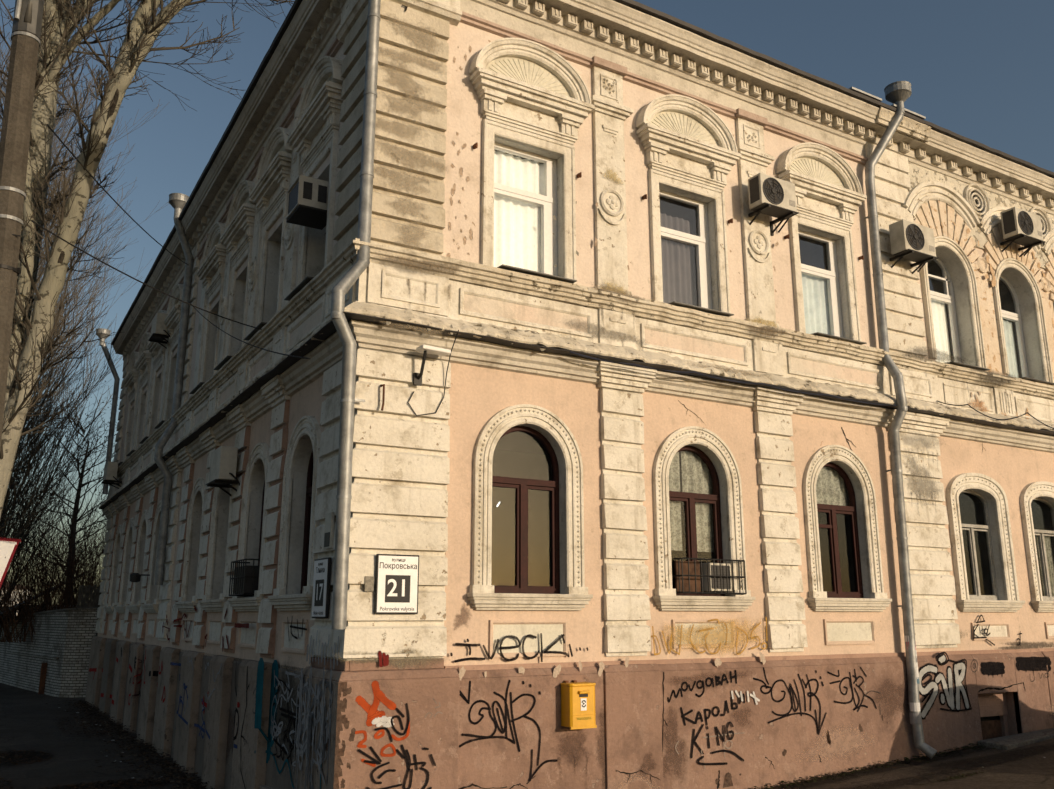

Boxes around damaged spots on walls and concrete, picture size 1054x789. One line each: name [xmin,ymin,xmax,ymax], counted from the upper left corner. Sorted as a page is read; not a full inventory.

peeling [447,132,473,257]
spalling [326,682,356,789]
crack [459,775,536,789]